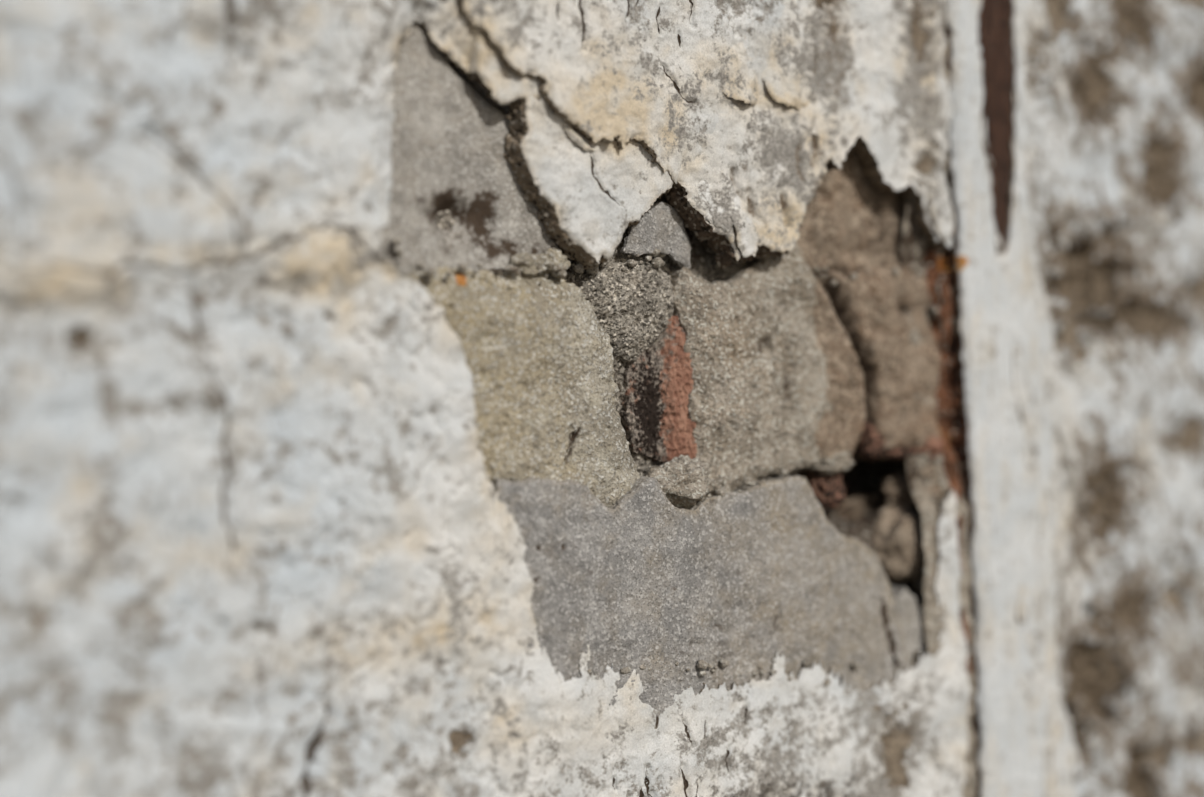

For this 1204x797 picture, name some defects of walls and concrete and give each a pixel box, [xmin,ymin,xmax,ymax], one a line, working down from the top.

crack [556,0,586,47]
crack [626,0,693,103]
spalling [379,0,962,729]
spalling [448,716,473,756]
spalling [874,698,914,793]